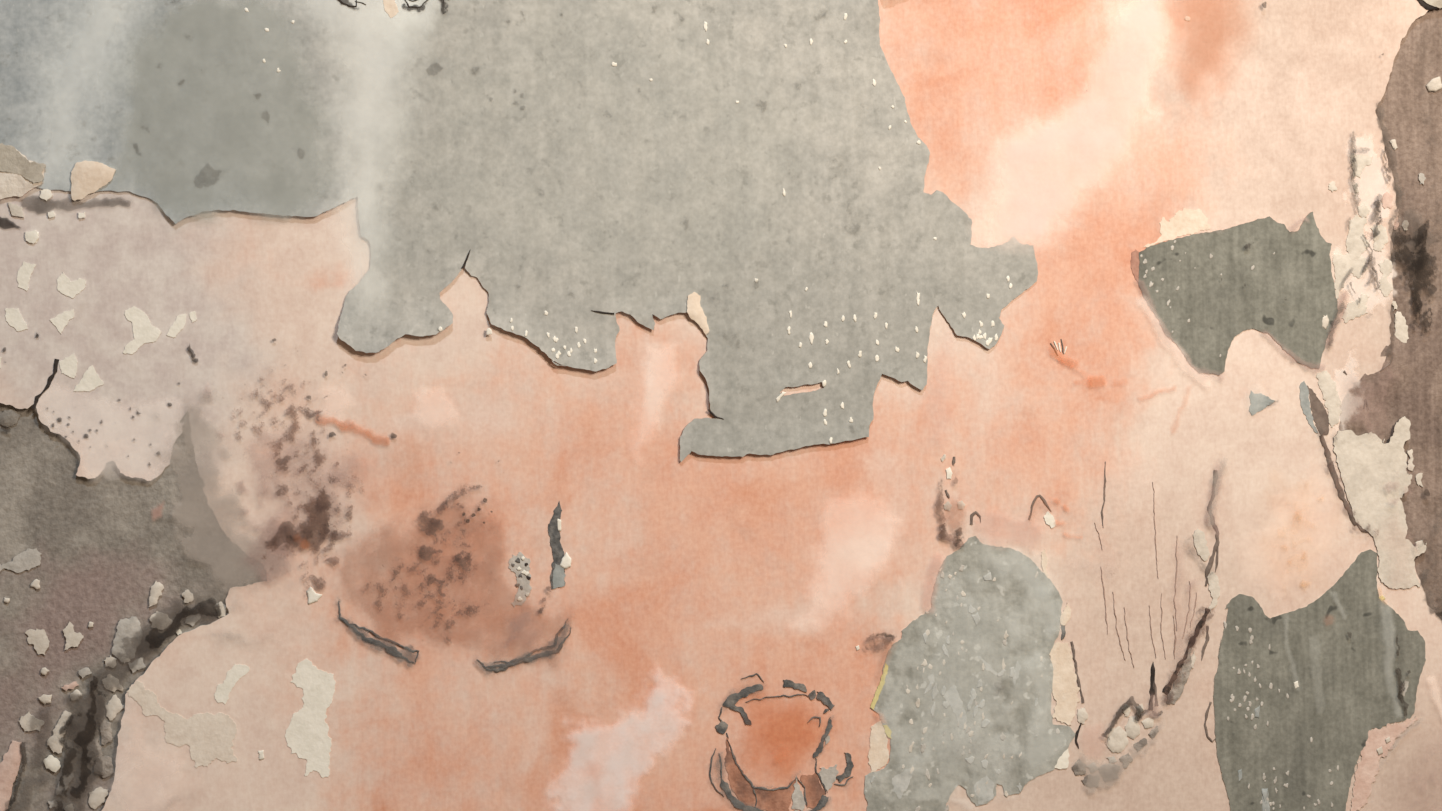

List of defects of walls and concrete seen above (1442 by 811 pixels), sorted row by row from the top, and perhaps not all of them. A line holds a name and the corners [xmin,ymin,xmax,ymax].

crack [338,0,366,9]
crack [402,0,448,14]
peeling [0,0,1038,462]
spalling [1316,8,1442,620]
water stain [182,378,362,605]
spalling [0,403,267,811]
water stain [339,604,419,666]
water stain [476,619,571,673]
water stain [509,502,571,614]
rust [709,673,854,811]
spalling [1054,662,1163,787]
flaking render [1350,716,1418,811]